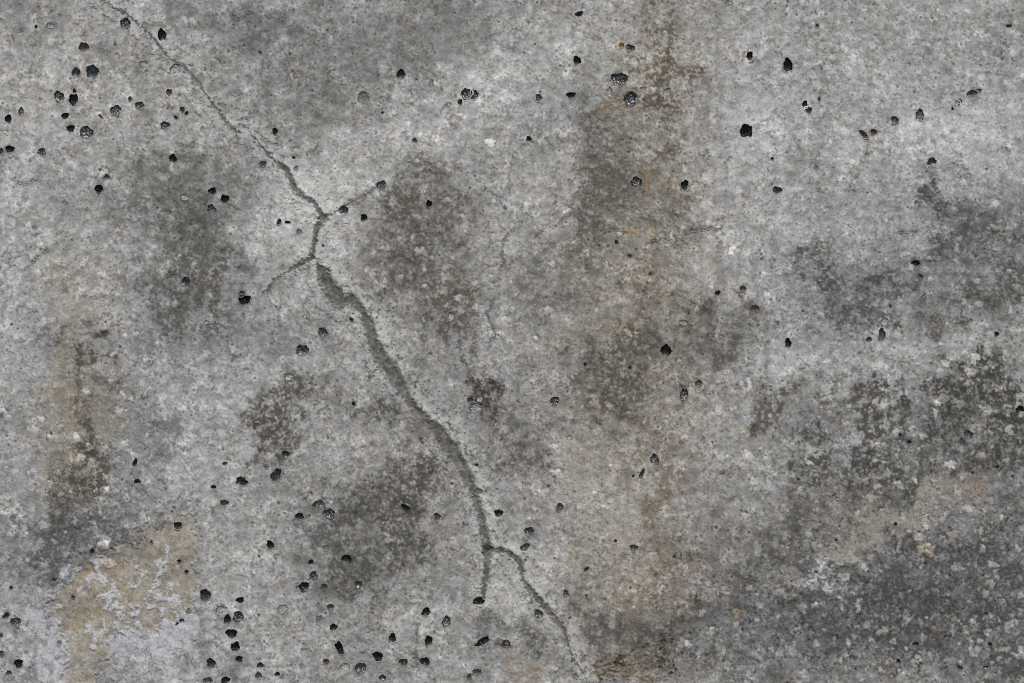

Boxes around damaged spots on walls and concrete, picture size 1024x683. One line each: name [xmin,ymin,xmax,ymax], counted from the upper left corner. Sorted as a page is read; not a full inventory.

water stain [119,145,259,354]
crack [88,0,607,683]
water stain [363,150,485,359]
water stain [669,88,1024,683]